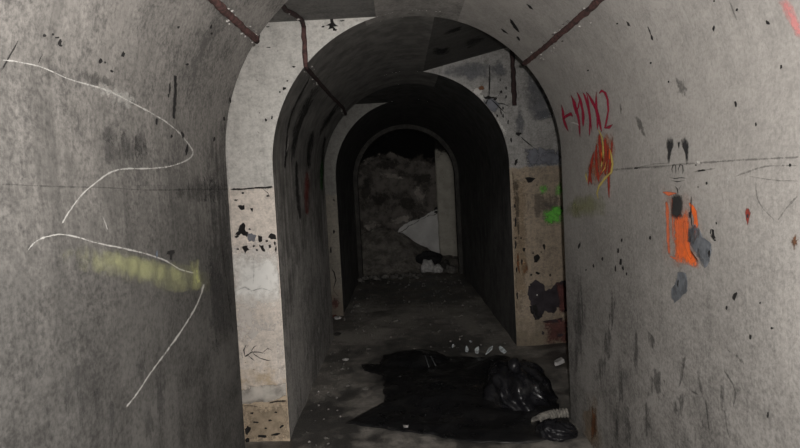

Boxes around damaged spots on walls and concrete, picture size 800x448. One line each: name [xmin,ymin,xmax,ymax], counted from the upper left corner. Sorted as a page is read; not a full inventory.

peeling [233,223,280,307]
peeling [515,237,568,343]
crack [242,345,271,361]